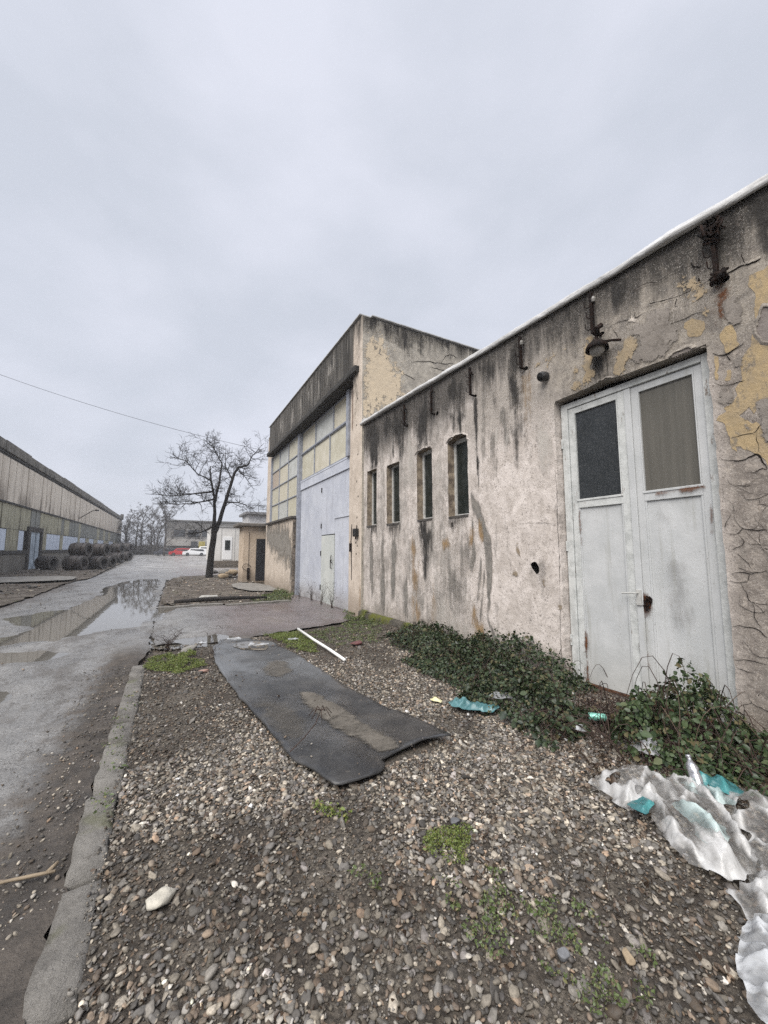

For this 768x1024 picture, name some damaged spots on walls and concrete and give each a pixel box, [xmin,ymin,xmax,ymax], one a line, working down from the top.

peeling [363,331,406,419]
water stain [369,317,429,356]
peeling [571,331,637,391]
crack [612,254,761,337]
peeling [668,266,768,465]
water stain [366,392,432,479]
water stain [369,525,408,619]
water stain [420,521,432,580]
water stain [434,342,519,639]
crack [722,426,768,638]